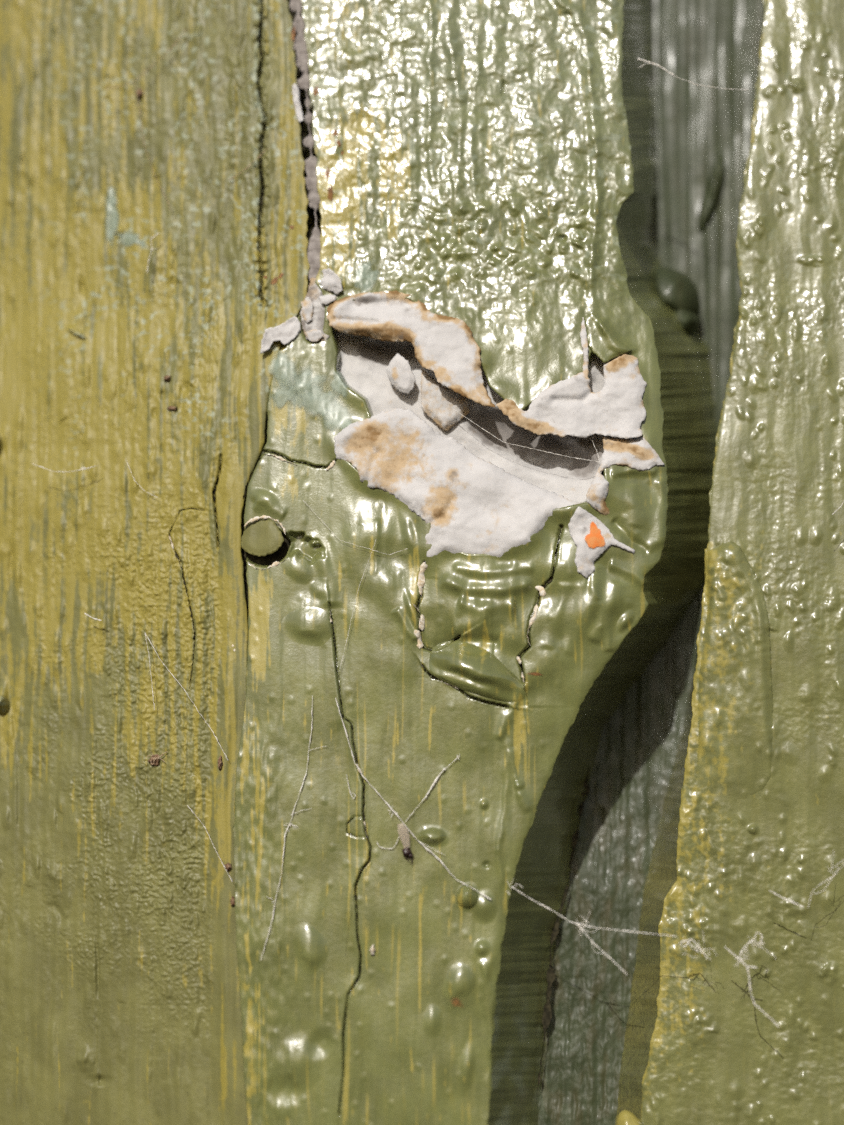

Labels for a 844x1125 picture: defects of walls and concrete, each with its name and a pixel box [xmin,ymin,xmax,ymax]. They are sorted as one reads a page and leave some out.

crack [255,0,321,300]
crack [169,422,336,687]
crack [413,562,503,706]
peeling [260,268,665,578]
crack [516,526,562,682]
crack [330,610,371,1113]